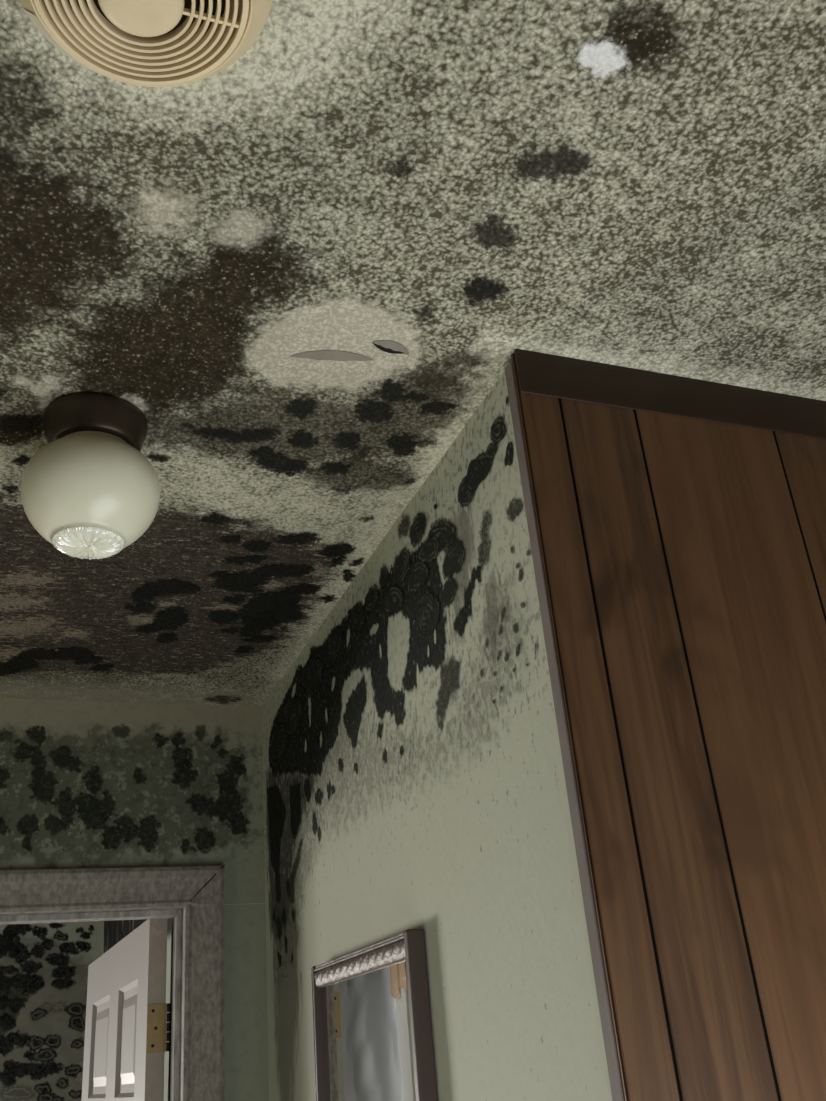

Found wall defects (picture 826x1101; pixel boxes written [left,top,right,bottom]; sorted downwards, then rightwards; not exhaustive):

leakage [0,150,312,414]
leakage [463,278,510,307]
leakage [0,414,45,468]
leakage [182,397,369,495]
leakage [355,379,460,424]
leakage [386,432,437,457]
leakage [458,416,513,508]
leakage [0,486,364,676]
leakage [0,724,161,852]
leakage [152,726,250,854]
leakage [266,504,491,967]
leakage [0,919,146,1101]